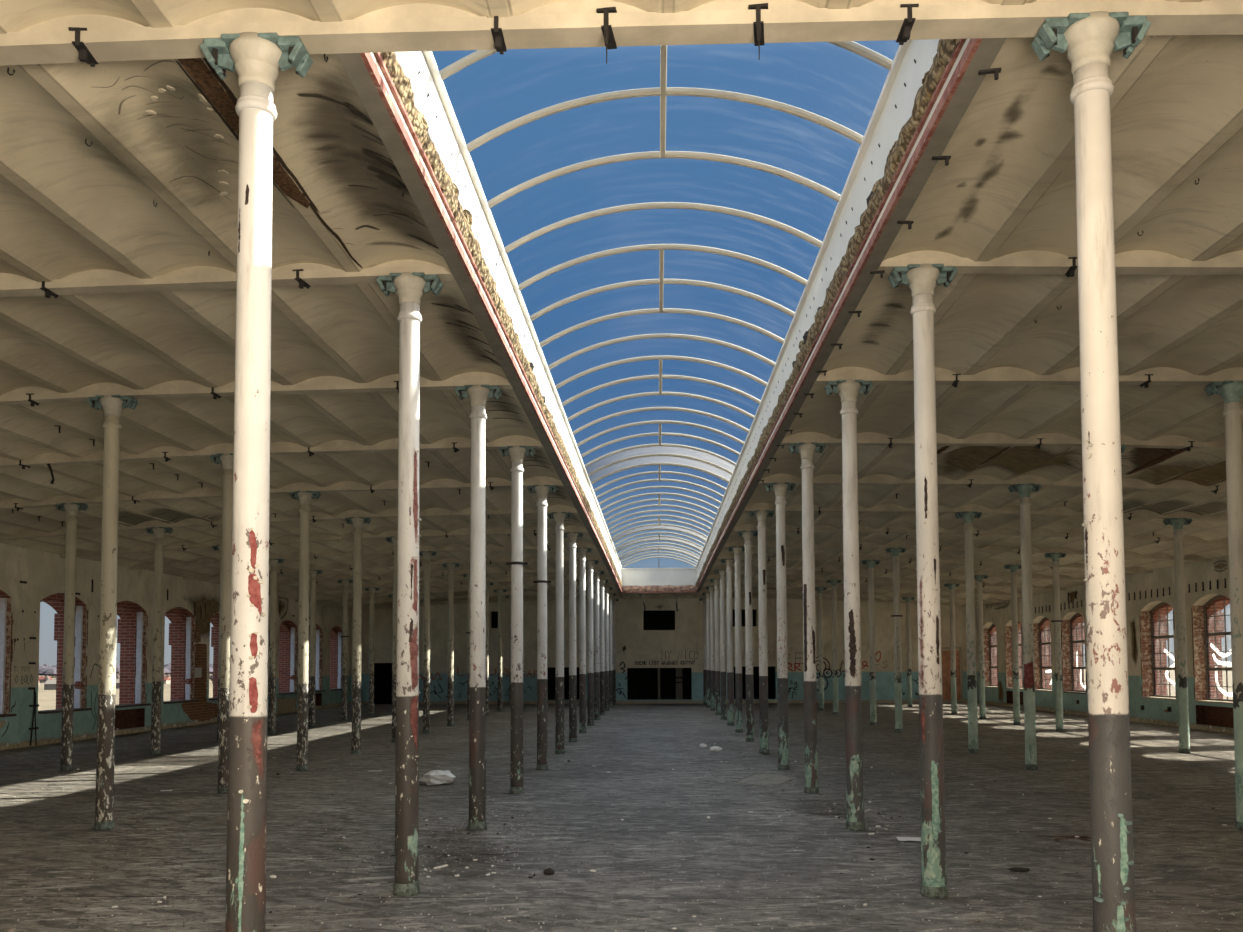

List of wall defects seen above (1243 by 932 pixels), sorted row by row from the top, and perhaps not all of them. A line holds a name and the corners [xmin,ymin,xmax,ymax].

damp [145,83,229,196]
damp [298,82,442,256]
peeling [409,450,421,757]
peeling [848,609,857,676]
peeling [920,555,941,688]
peeling [238,789,249,932]
peeling [1093,813,1134,932]